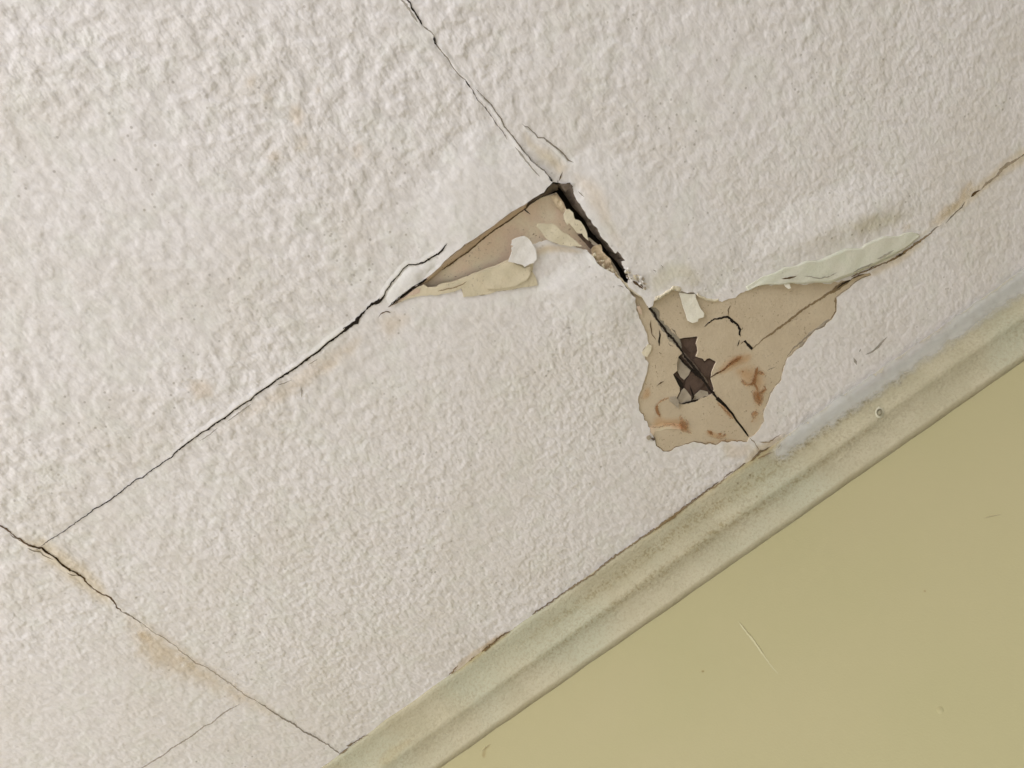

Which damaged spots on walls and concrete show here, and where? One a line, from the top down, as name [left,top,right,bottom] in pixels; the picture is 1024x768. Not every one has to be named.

crack [401,0,584,197]
crack [0,242,447,768]
peeling [390,183,920,452]
crack [532,154,1024,615]
crack [449,631,510,675]